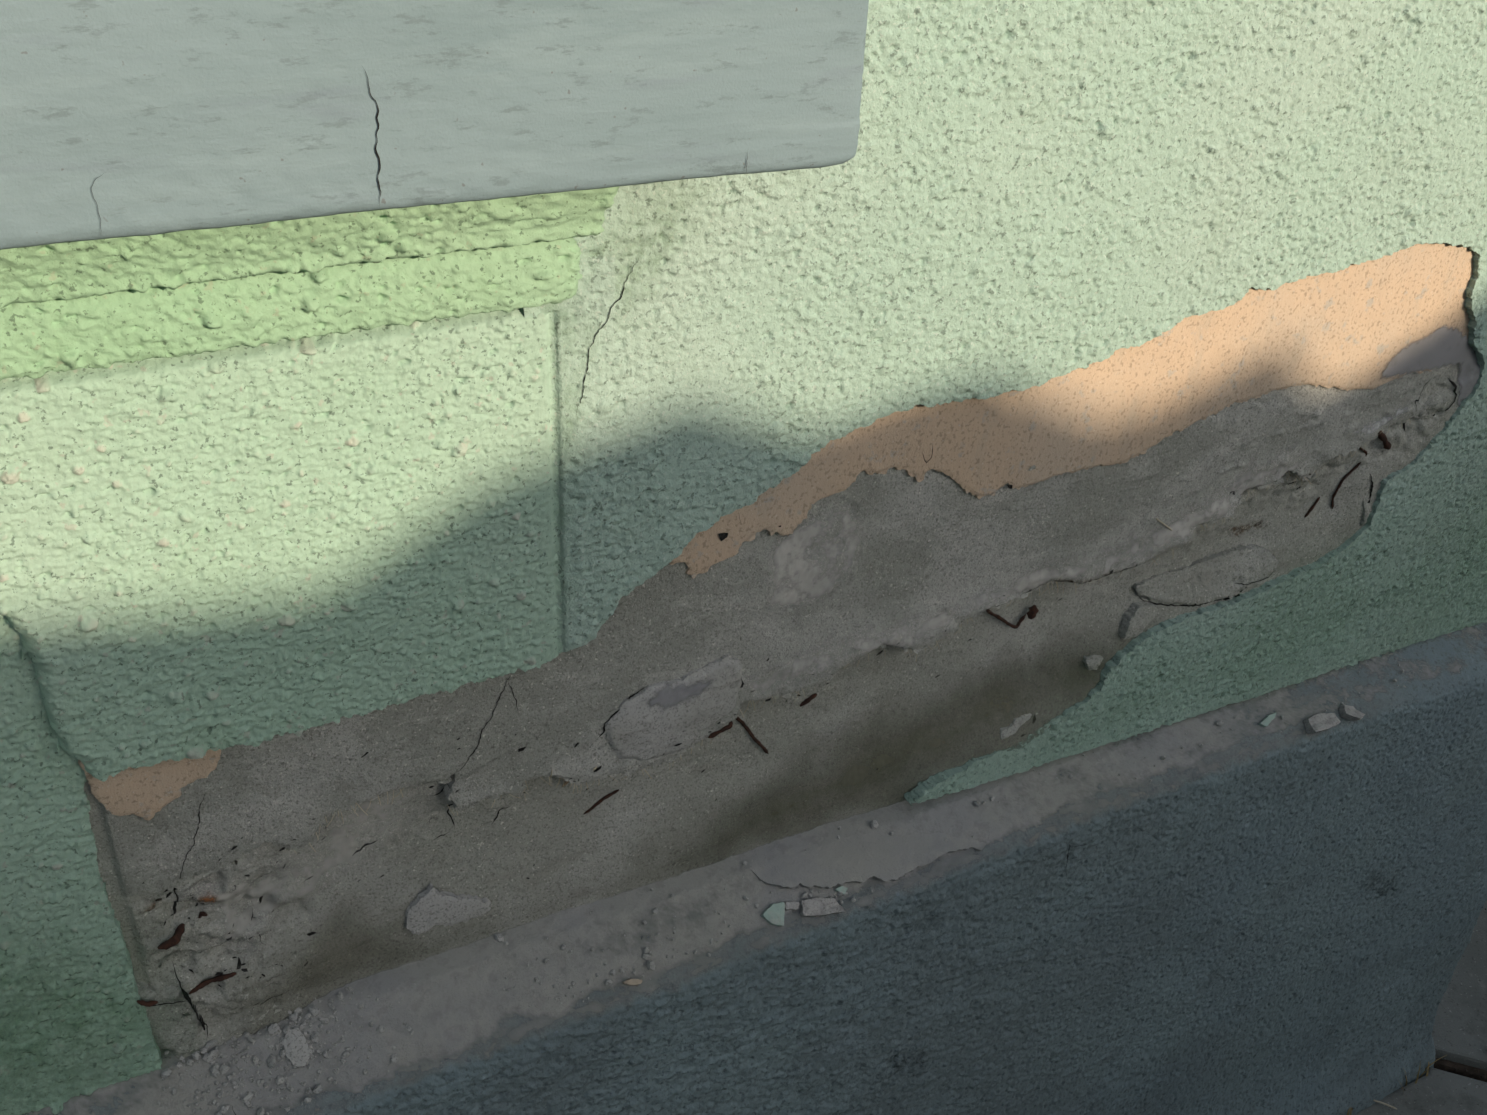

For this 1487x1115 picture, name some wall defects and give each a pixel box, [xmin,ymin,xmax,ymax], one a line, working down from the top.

crack [363,68,381,204]
spalling [78,243,1474,1059]
crack [429,675,518,838]
crack [173,794,205,915]
crack [153,961,208,1037]